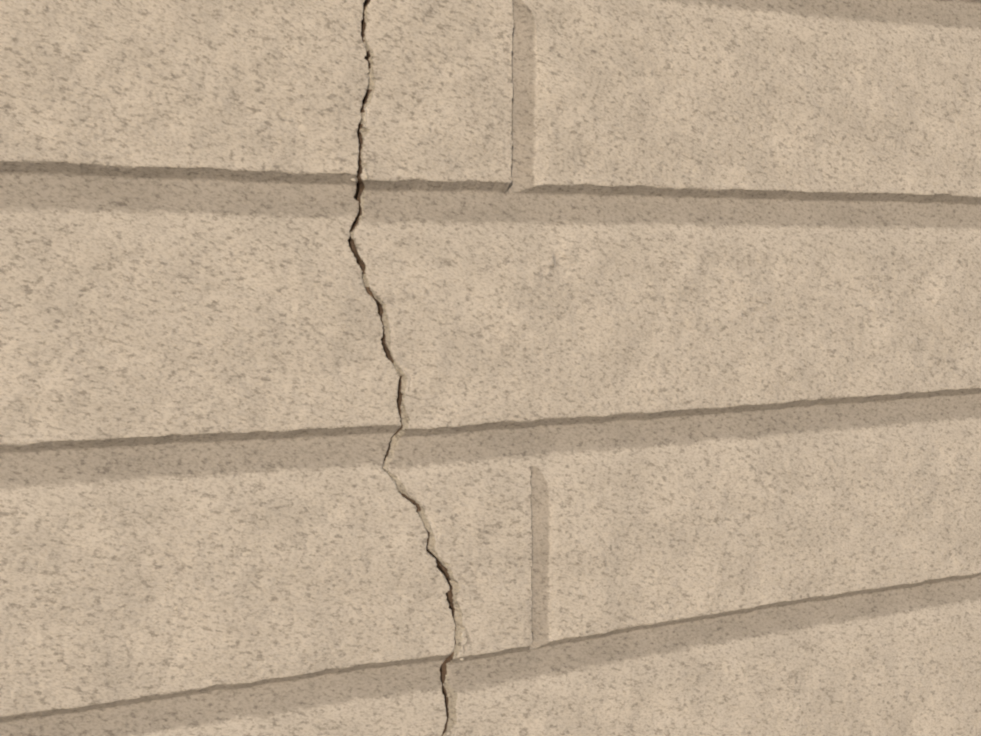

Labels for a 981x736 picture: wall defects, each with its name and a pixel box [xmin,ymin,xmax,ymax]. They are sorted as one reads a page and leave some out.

crack [348,0,475,736]